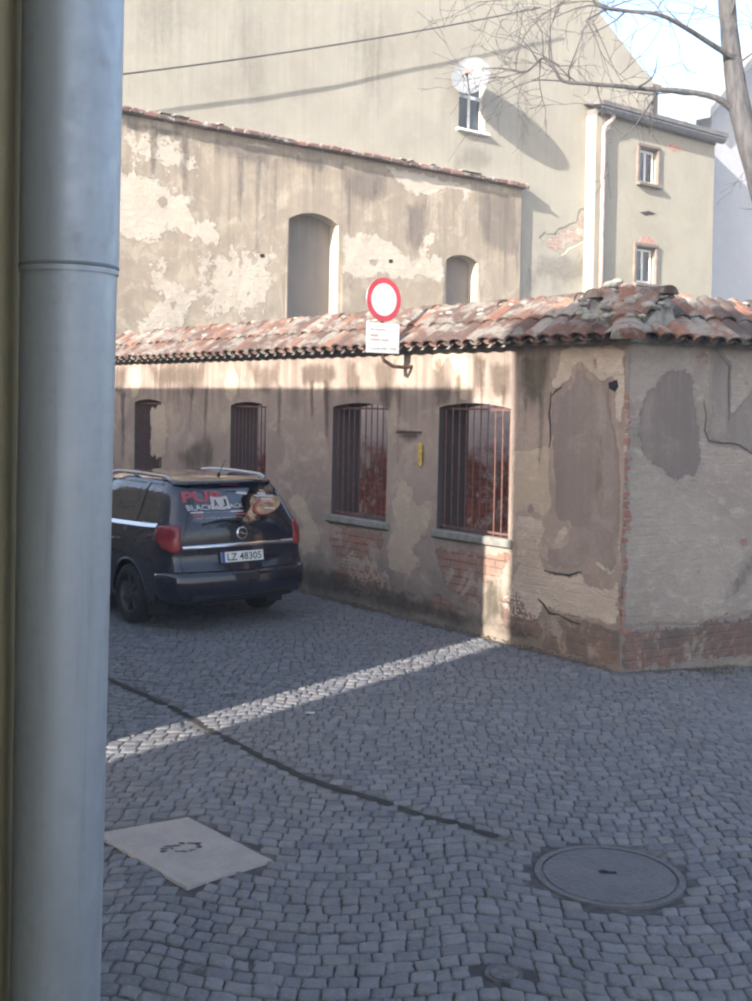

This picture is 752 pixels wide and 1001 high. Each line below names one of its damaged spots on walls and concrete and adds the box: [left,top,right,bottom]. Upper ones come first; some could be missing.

peeling [120,117,281,331]
peeling [342,229,444,282]
leakage [303,366,333,425]
leakage [347,364,359,392]
leakage [375,364,400,405]
crack [704,405,752,453]
peeling [288,494,322,556]
peeling [335,479,433,597]
spalling [431,342,752,671]